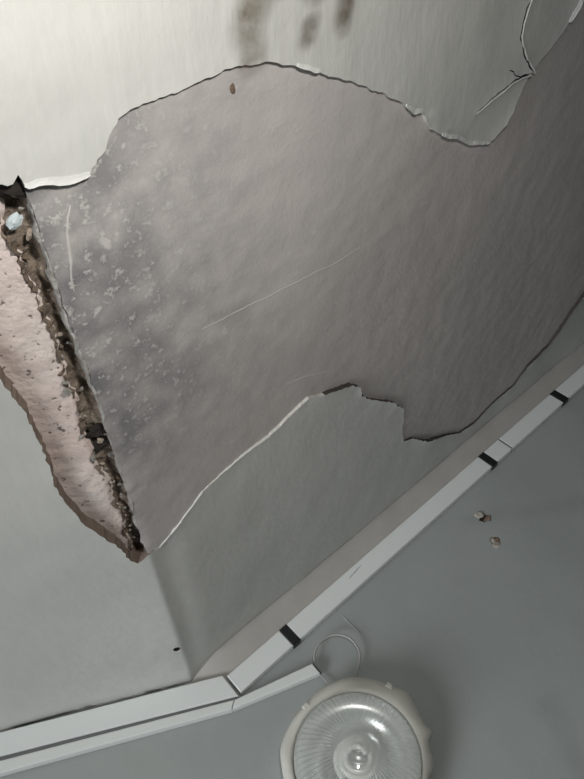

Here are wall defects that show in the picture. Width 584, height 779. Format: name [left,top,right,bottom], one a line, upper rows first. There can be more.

peeling [0,0,584,554]
crack [477,0,536,114]